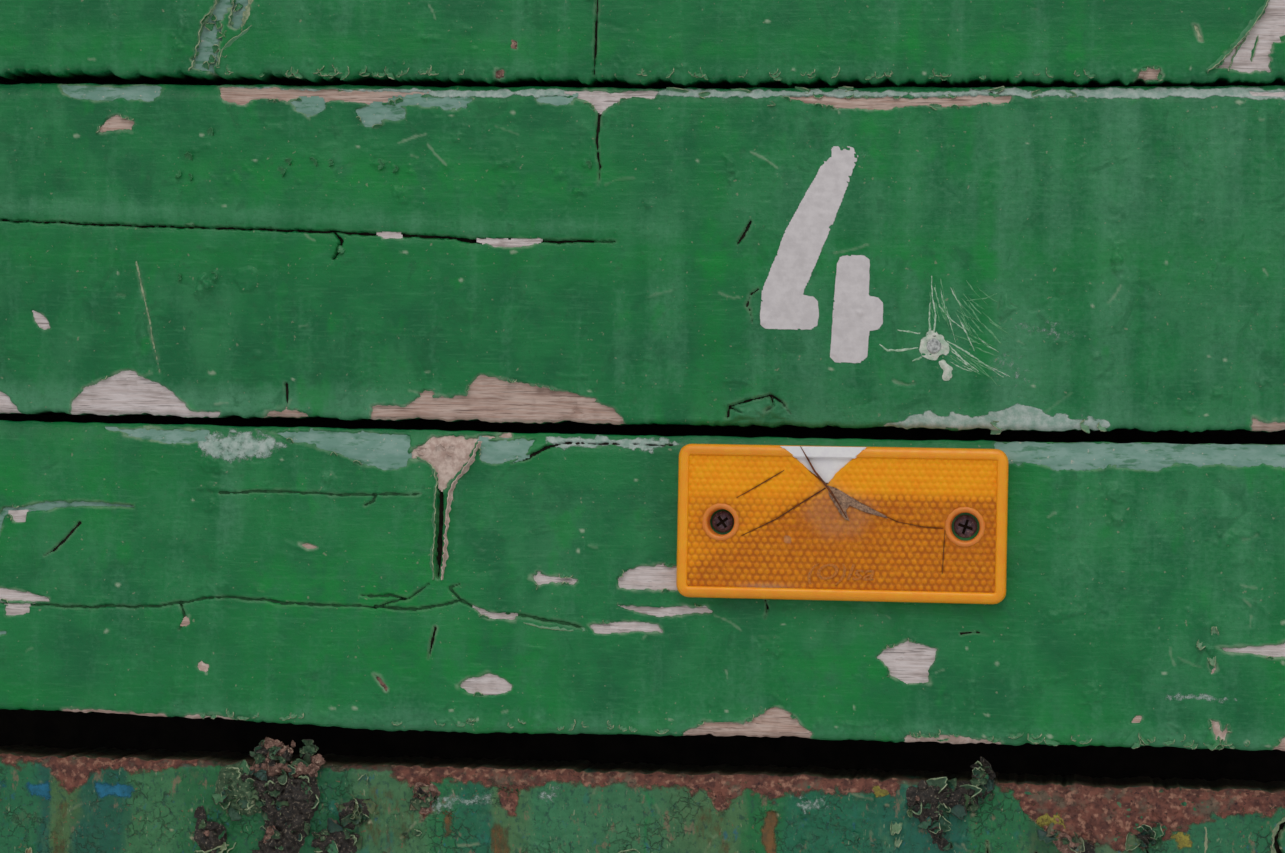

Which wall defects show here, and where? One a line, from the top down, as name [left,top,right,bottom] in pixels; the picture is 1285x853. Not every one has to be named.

peeling [188,0,1285,128]
crack [595,113,603,180]
peeling [884,404,1285,471]
peeling [71,370,679,580]
crack [0,490,473,653]
crack [505,612,581,628]
peeling [473,561,713,634]
peeling [877,638,937,684]
peeling [655,707,812,738]
corrosion [0,753,198,806]
corrosion [194,737,376,853]
corrosion [371,757,1285,853]